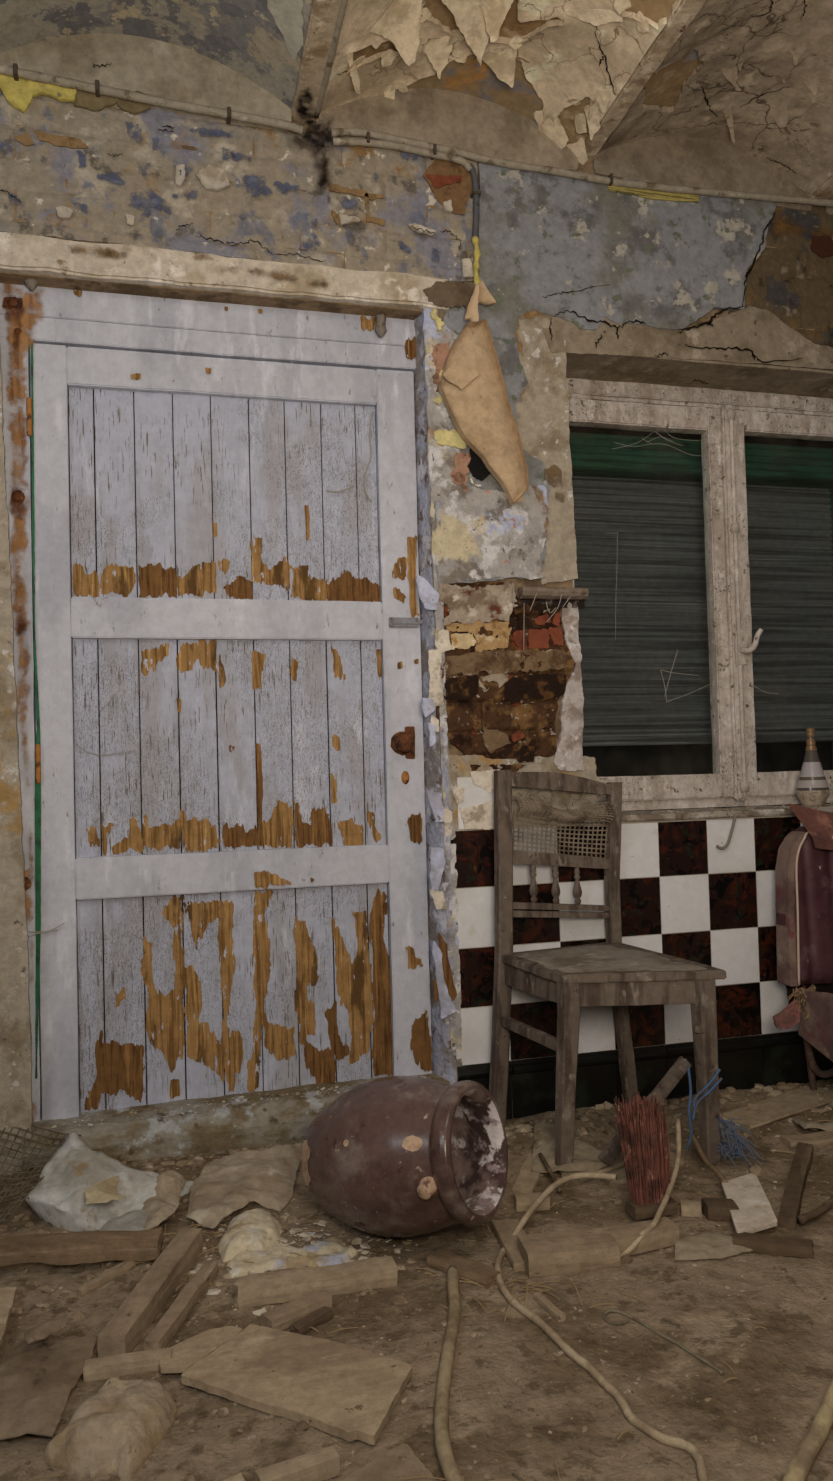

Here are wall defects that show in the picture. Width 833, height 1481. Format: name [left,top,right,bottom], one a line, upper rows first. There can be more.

peeling [0,74,299,227]
flaking render [302,173,385,249]
peeling [398,223,439,261]
peeling [320,0,833,197]
crack [595,26,618,96]
crack [544,212,833,385]
crack [702,87,784,116]
crack [720,0,808,32]
flaking render [433,429,490,492]
flaking render [72,535,585,909]
peeling [85,870,393,1110]
peeling [405,941,456,1072]